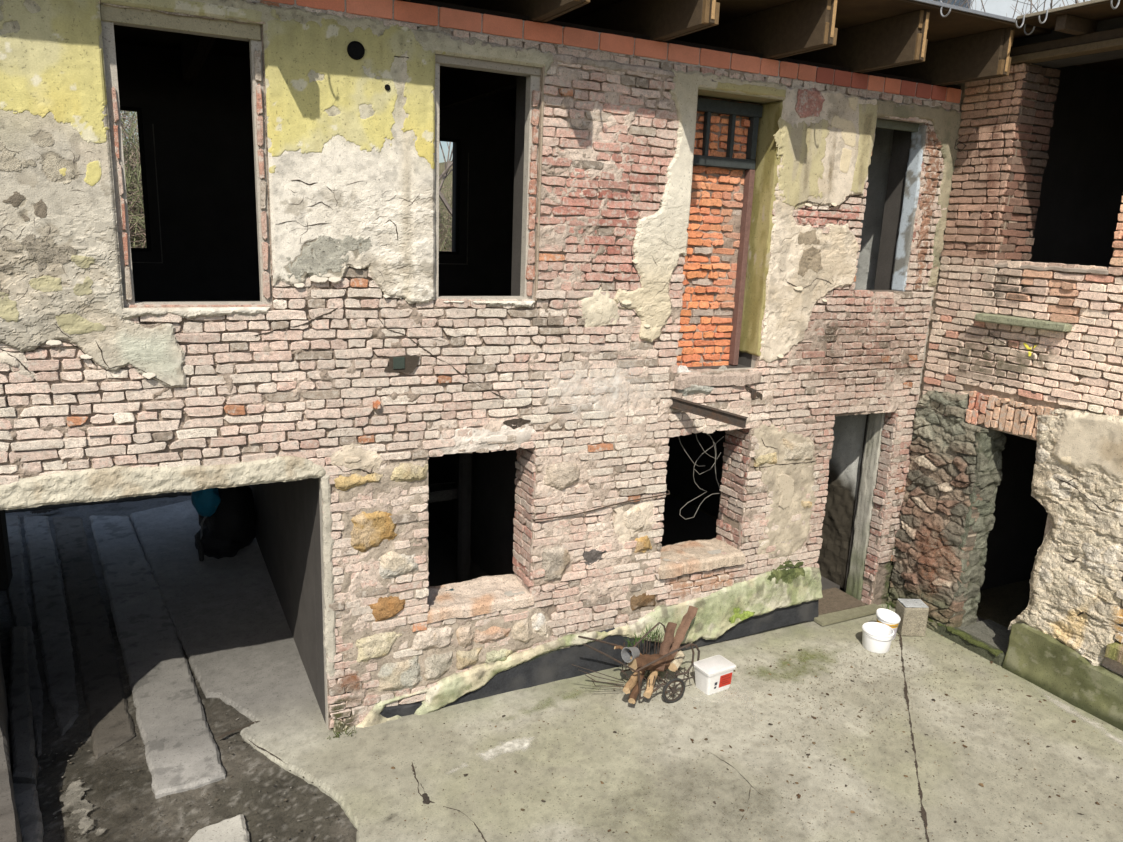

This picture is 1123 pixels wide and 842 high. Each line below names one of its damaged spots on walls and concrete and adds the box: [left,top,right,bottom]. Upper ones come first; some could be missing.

peeling [0,0,554,388]
crack [275,180,419,287]
peeling [577,69,962,363]
peeling [697,409,730,432]
peeling [741,412,817,559]
peeling [1026,408,1123,610]
crack [411,763,487,842]
crack [899,635,929,842]